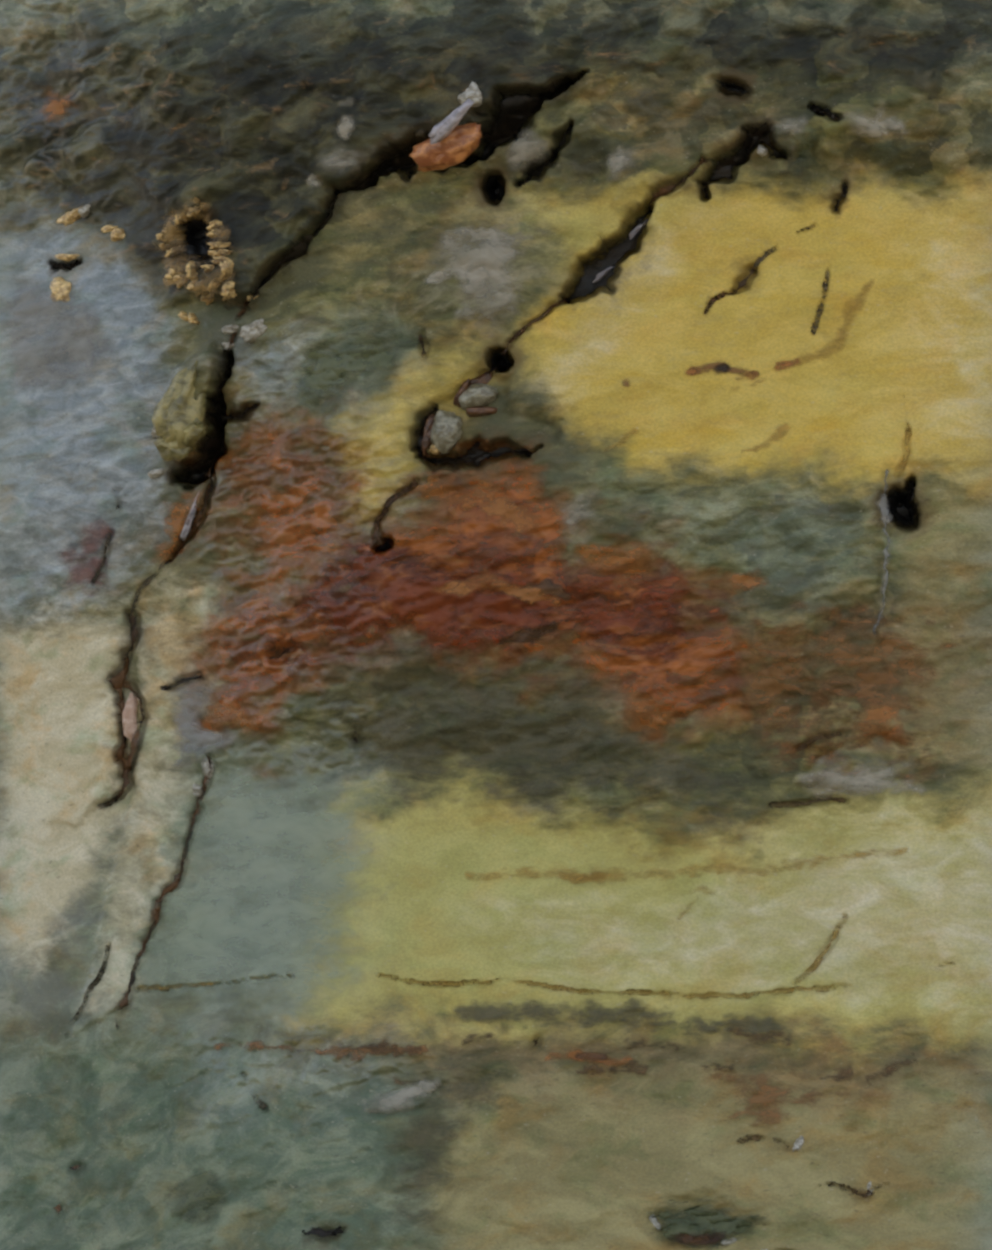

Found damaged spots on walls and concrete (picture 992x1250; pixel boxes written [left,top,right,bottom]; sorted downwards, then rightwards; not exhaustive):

damp [338,118,353,138]
damp [509,134,543,166]
peeling [156,197,259,325]
peeling [221,318,267,351]
crack [480,122,787,378]
crack [704,227,810,314]
crack [99,74,583,809]
corrosion [193,426,755,738]
damp [175,690,233,766]
crack [72,757,212,1027]
damp [149,765,357,1014]
peeling [673,1233,738,1246]